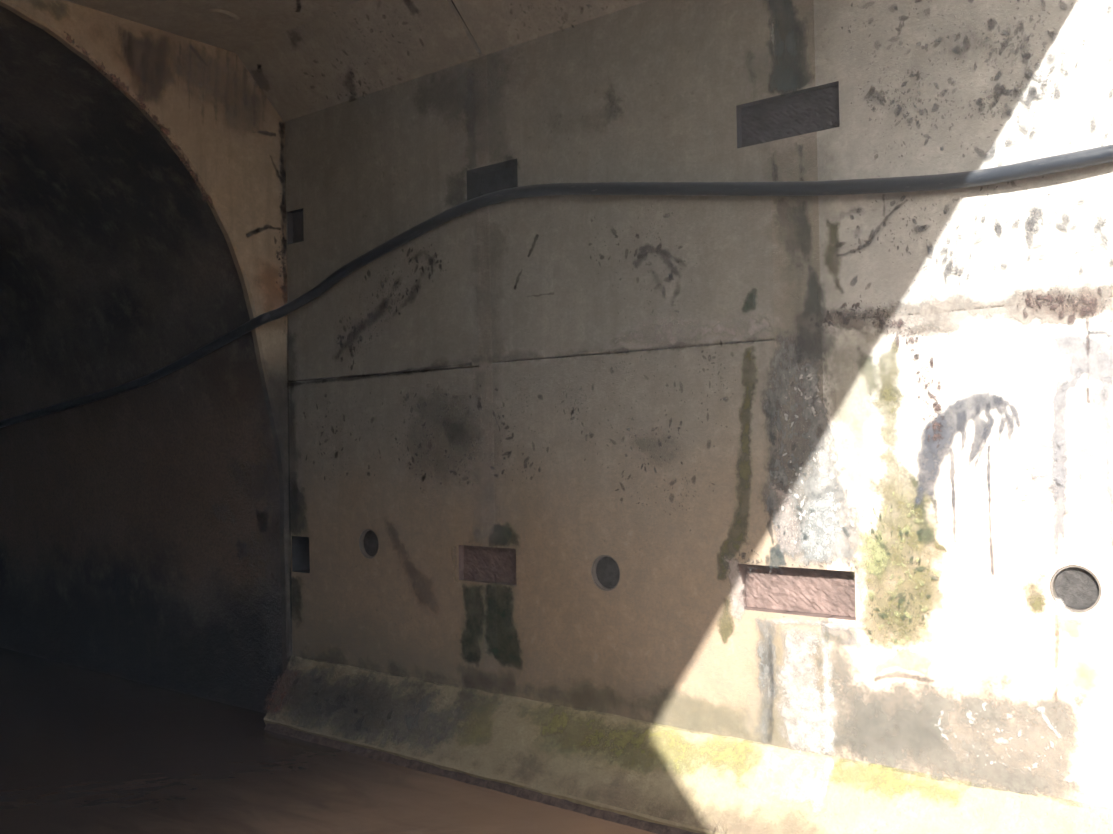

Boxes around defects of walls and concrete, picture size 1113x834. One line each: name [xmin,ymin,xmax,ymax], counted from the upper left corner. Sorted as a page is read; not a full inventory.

water stain [763,268,860,567]
water stain [915,392,1020,534]
water stain [1014,318,1113,555]
water stain [282,658,500,748]
water stain [757,621,1086,806]